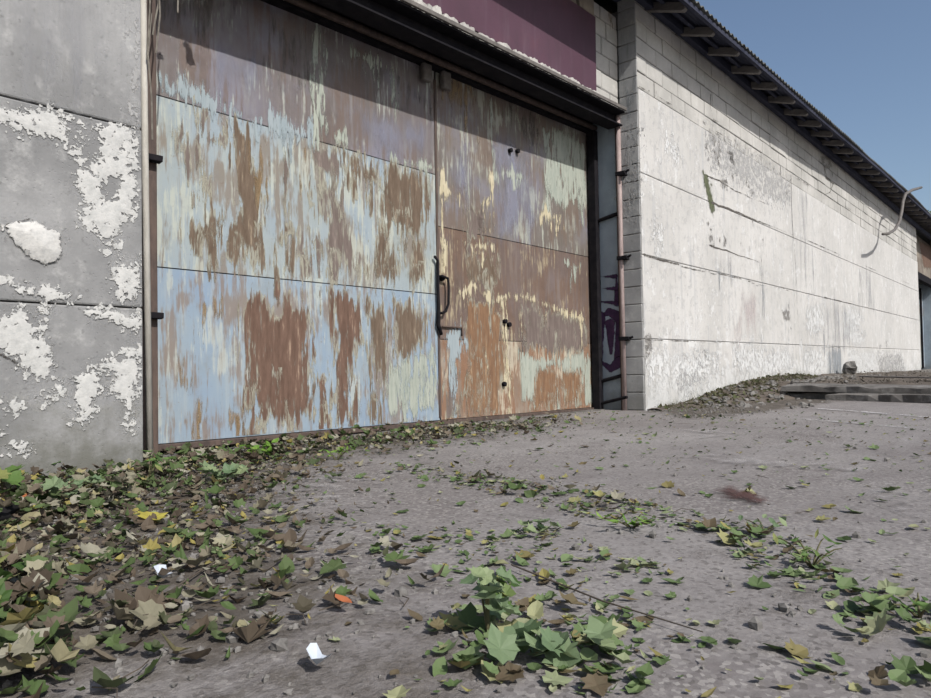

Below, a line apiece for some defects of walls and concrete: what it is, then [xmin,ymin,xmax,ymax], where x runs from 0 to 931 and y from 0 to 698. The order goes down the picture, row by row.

peeling [0,101,142,461]
corrosion [172,95,433,440]
corrosion [442,250,504,418]
corrosion [518,303,590,412]